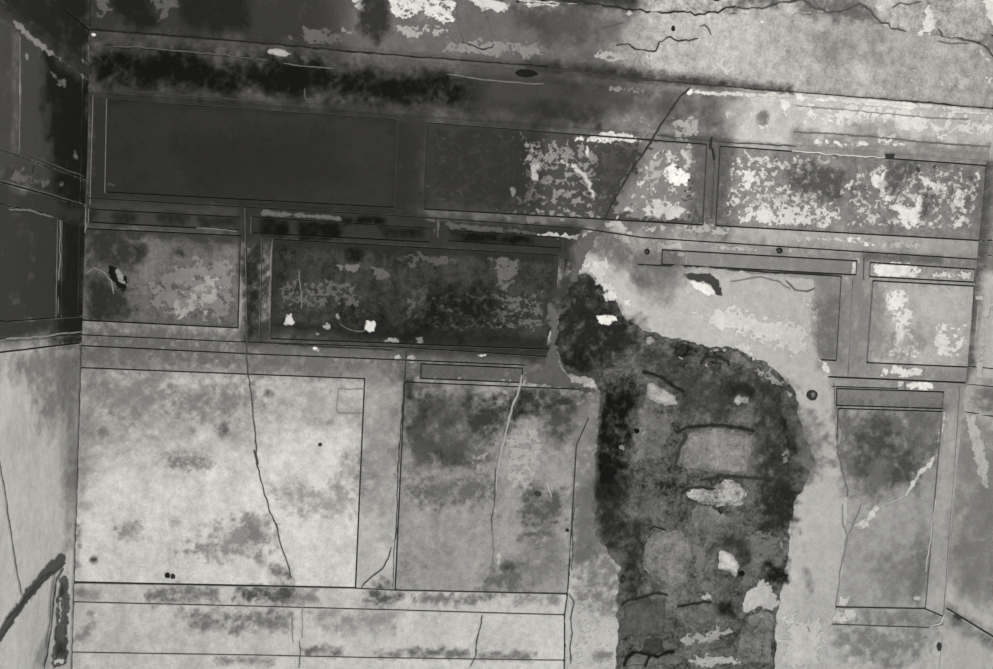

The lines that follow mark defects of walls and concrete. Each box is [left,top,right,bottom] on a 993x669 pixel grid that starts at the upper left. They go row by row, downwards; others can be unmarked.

spalling [388,0,993,68]
crack [562,0,922,52]
peeling [596,86,644,94]
peeling [687,63,993,115]
crack [90,28,993,221]
crack [266,243,274,308]
crack [296,270,304,309]
water stain [17,212,646,617]
spalling [405,113,980,669]
crack [245,320,407,589]
crack [486,468,496,588]